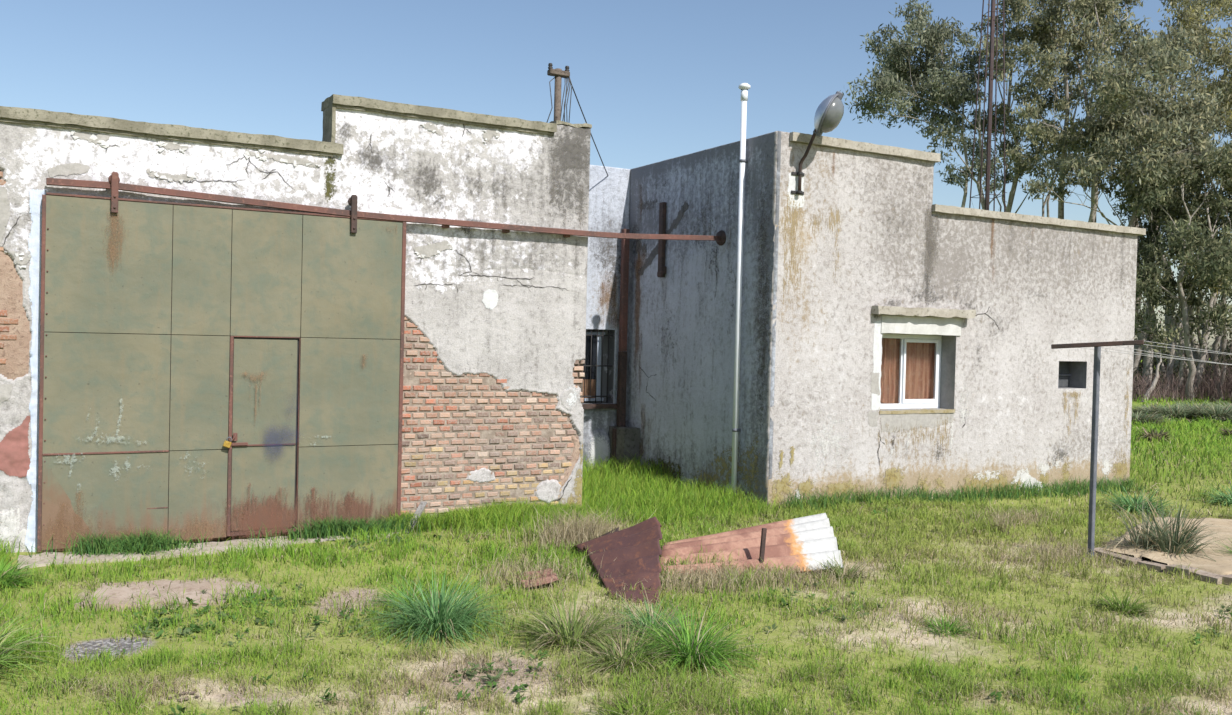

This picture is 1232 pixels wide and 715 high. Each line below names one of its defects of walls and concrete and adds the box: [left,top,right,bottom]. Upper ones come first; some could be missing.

peeling [69,129,110,148]
peeling [155,139,188,153]
peeling [244,148,320,168]
leakage [324,157,339,201]
leakage [414,166,444,207]
leakage [549,126,591,224]
leakage [594,189,737,282]
spalling [0,247,31,380]
rust [602,239,649,392]
spalling [401,316,585,518]
leakage [974,390,1081,483]
rust [225,484,398,539]